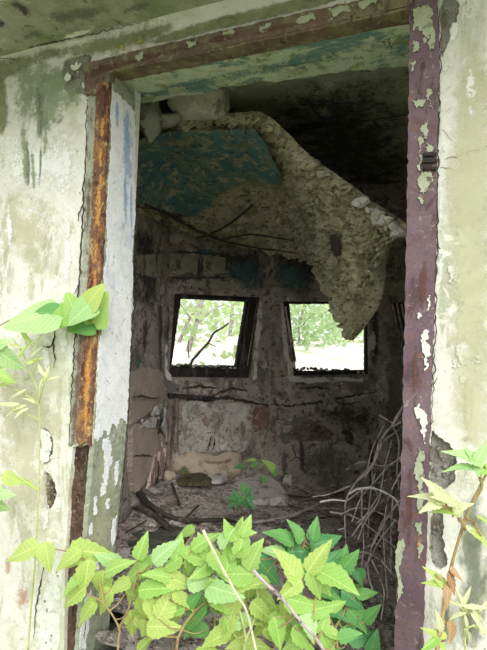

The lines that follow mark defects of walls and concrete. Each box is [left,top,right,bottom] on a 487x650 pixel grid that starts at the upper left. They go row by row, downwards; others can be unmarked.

peeling [296,13,316,25]
peeling [328,0,378,20]
damp [1,87,78,193]
corrosion [97,85,105,137]
corrosion [87,176,102,261]
peeling [93,87,274,515]
flaking render [411,0,460,514]
corrosion [72,334,93,443]
crack [117,291,373,540]
peeling [40,429,57,530]
peeling [395,538,405,602]
spalling [414,510,448,569]